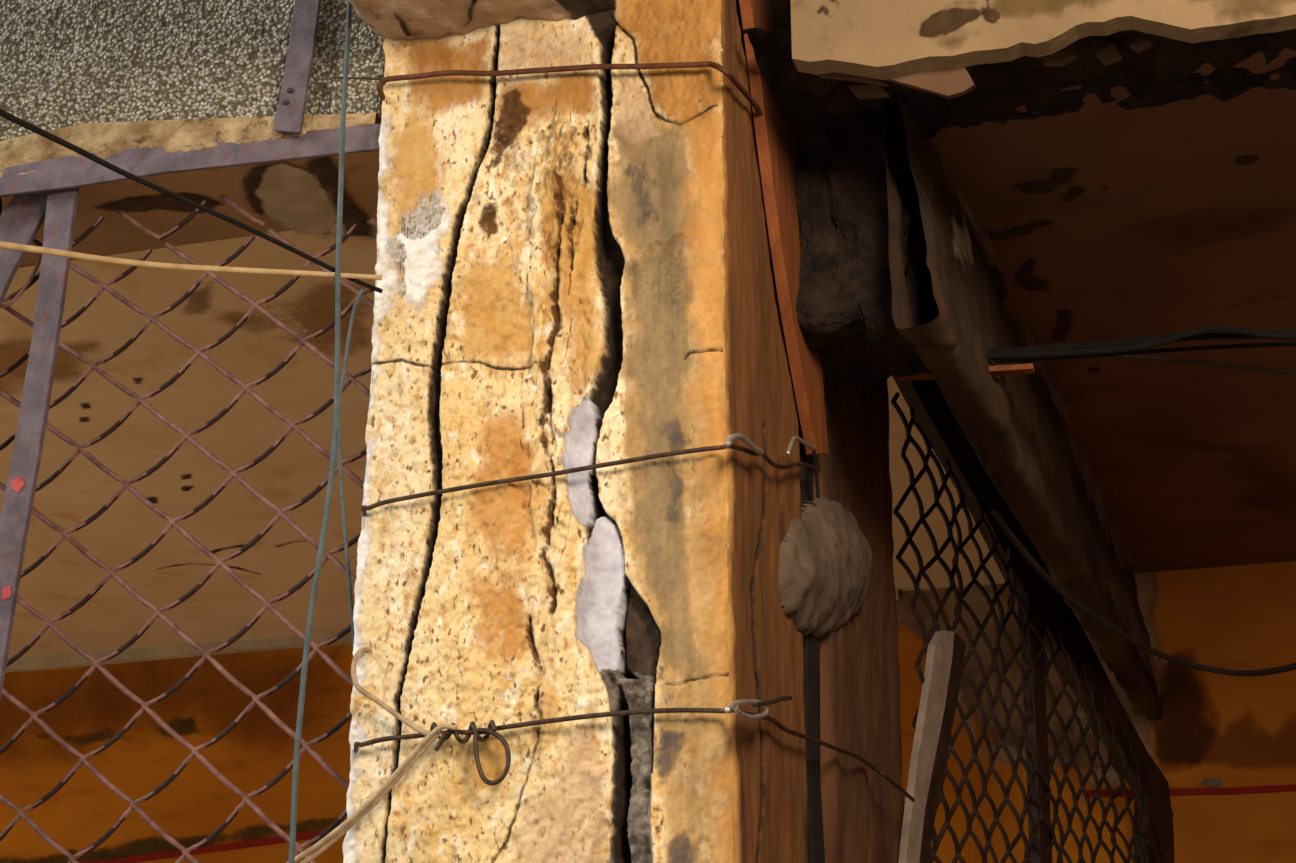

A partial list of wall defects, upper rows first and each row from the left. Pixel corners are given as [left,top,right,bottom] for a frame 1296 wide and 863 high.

peeling [920,7,1000,37]
crack [587,23,717,679]
crack [684,349,723,360]
crack [373,0,540,863]
water stain [1151,658,1296,769]